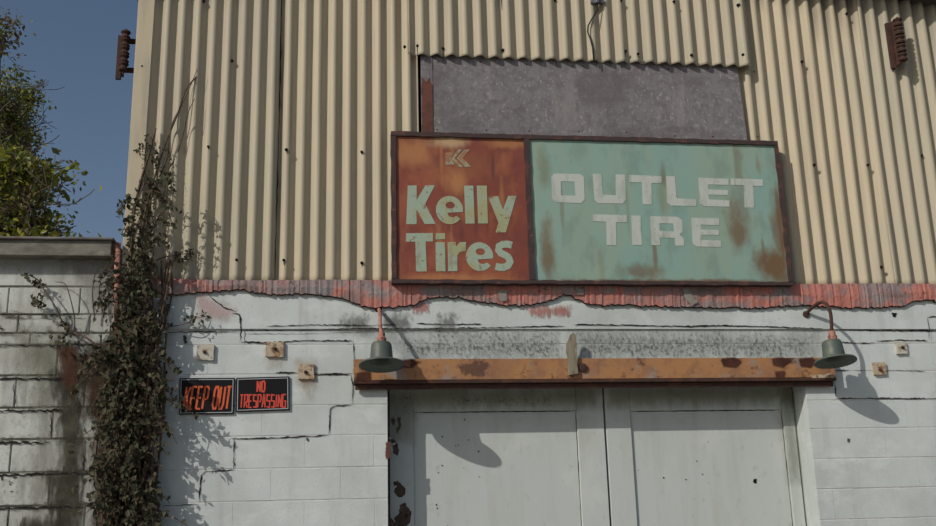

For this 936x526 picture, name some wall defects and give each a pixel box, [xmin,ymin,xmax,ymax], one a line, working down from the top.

peeling [525,305,570,318]
corrosion [721,357,741,368]
corrosion [772,357,816,379]
crack [157,294,936,522]
damp [0,322,146,526]